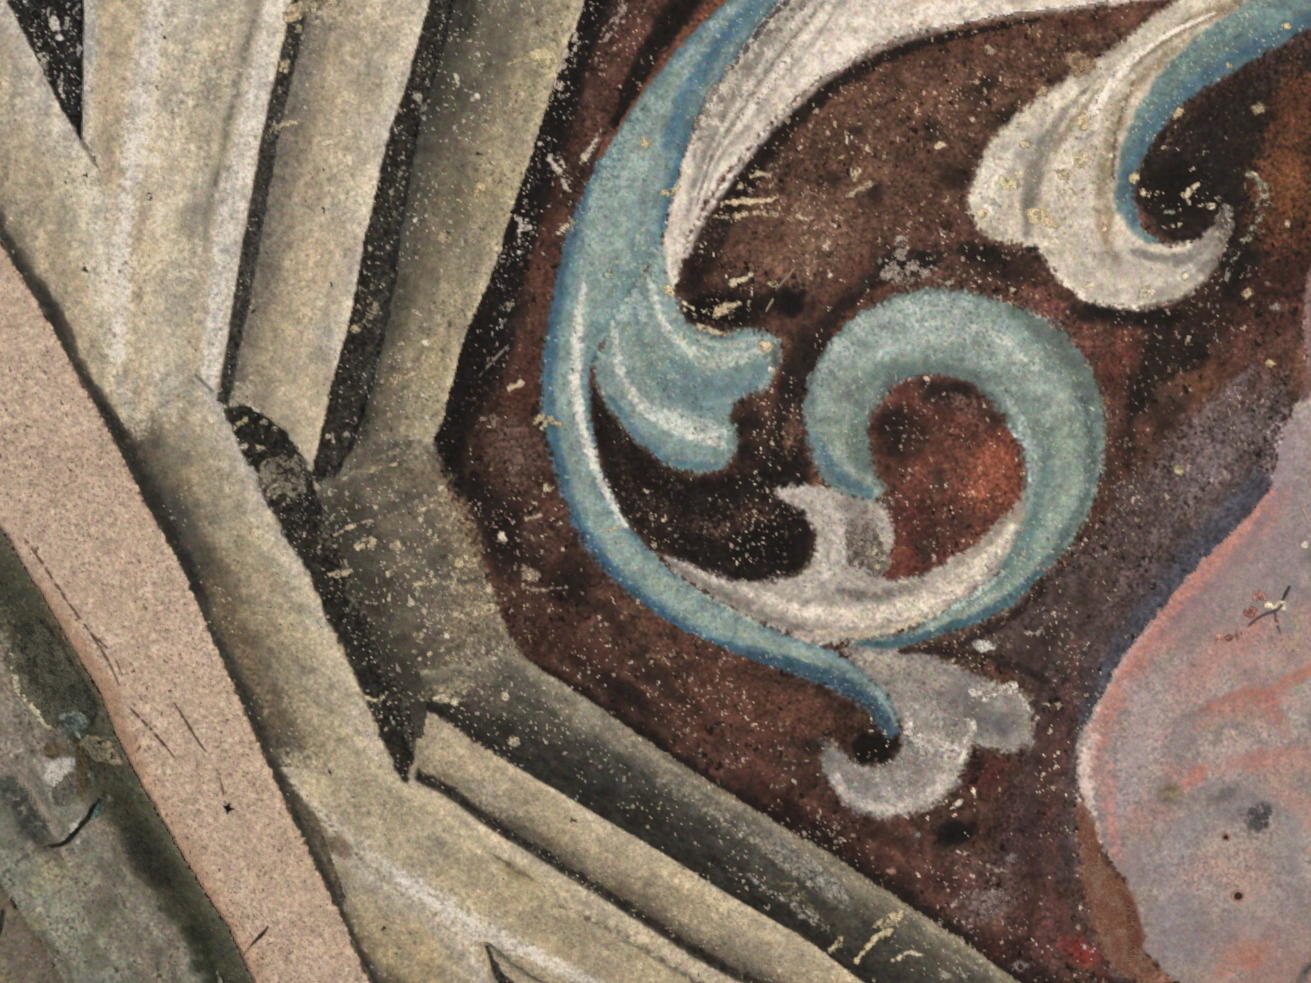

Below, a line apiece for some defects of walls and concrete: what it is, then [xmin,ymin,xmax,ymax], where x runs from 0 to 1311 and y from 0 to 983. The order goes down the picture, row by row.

crack [26,541,205,757]
crack [0,796,111,932]
crack [220,780,234,814]